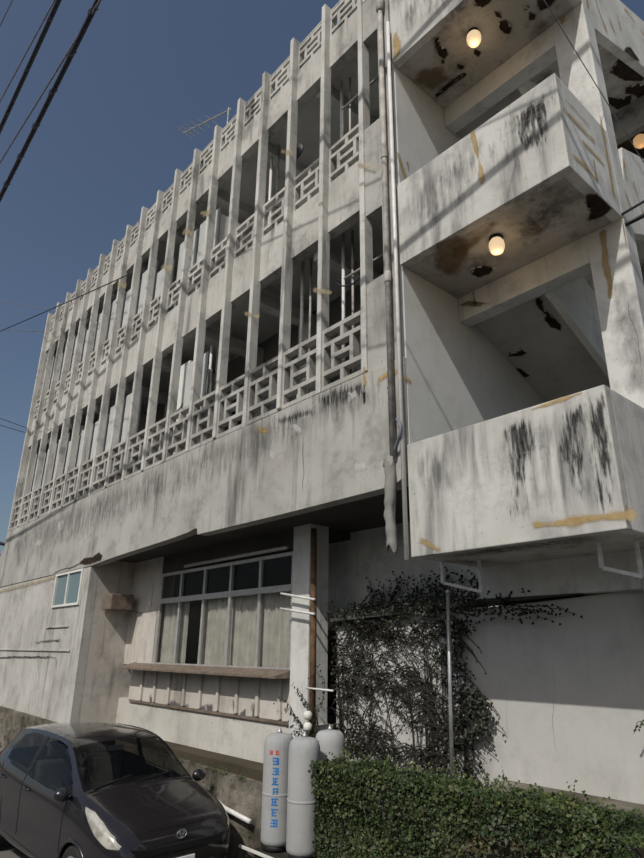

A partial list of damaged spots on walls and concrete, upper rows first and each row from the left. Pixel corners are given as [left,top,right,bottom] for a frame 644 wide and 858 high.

spalling [524,0,556,21]
spalling [435,64,467,97]
spalling [607,47,644,117]
leakage [517,95,547,149]
spalling [585,194,612,221]
leakage [436,238,479,274]
spalling [471,265,496,278]
spalling [535,297,562,331]
leakage [322,368,366,406]
leakage [533,392,581,409]
leakage [504,421,533,499]
leakage [533,396,636,528]